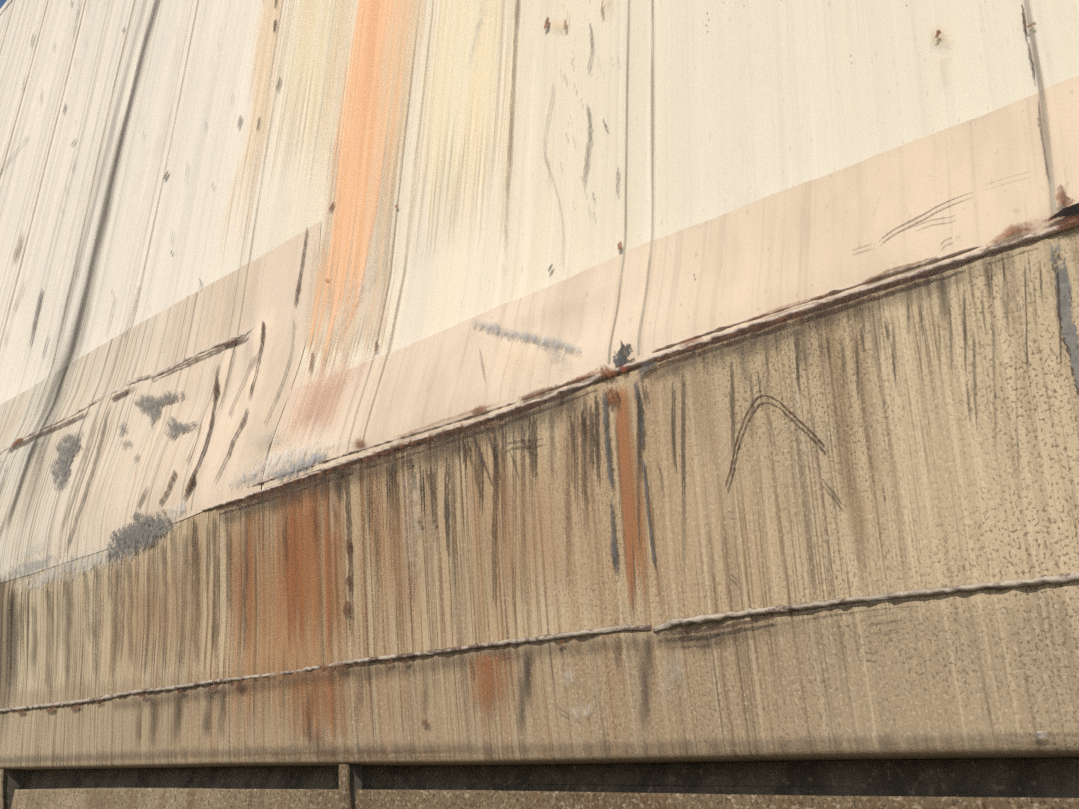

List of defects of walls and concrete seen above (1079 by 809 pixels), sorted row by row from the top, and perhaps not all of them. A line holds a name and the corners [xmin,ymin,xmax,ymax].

corrosion [307,0,421,371]
corrosion [984,224,1029,250]
peeling [1044,185,1079,229]
peeling [1050,243,1079,388]
leakage [386,394,599,600]
leakage [637,385,648,471]
leakage [671,374,684,493]
corrosion [576,259,930,603]
leakage [178,517,215,658]